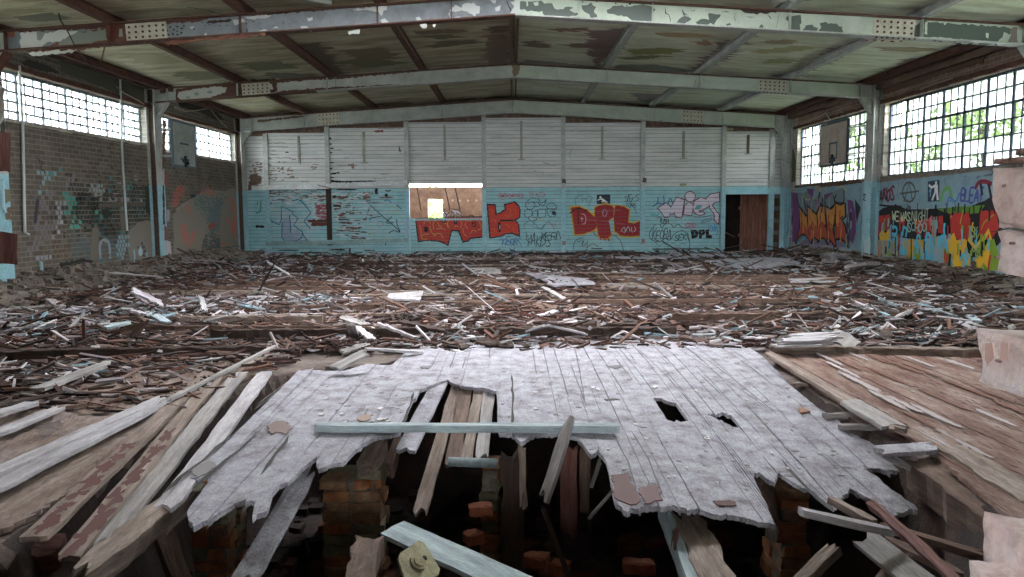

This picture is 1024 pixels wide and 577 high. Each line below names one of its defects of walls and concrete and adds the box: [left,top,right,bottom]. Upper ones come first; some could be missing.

peeling [20,29,123,56]
peeling [233,15,278,31]
peeling [348,6,388,35]
peeling [450,0,655,21]
peeling [677,11,731,26]
peeling [786,15,843,32]
peeling [914,20,1011,46]
peeling [248,158,412,241]